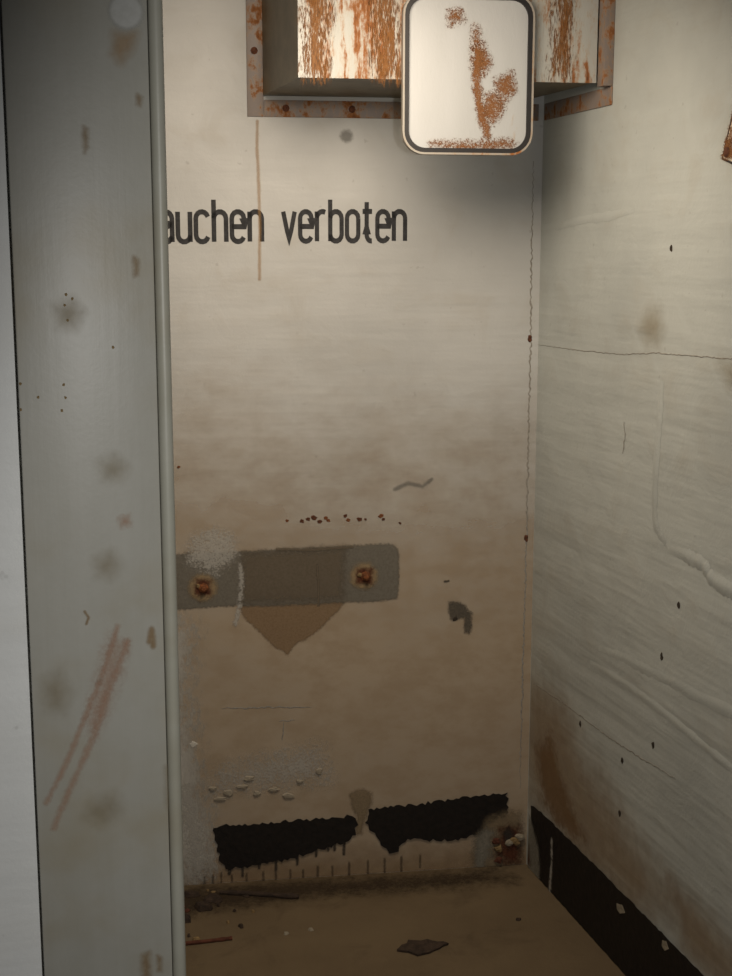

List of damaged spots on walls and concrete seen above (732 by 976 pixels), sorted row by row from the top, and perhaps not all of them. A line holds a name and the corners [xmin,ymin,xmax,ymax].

peeling [213,790,540,879]
leakage [175,503,639,885]